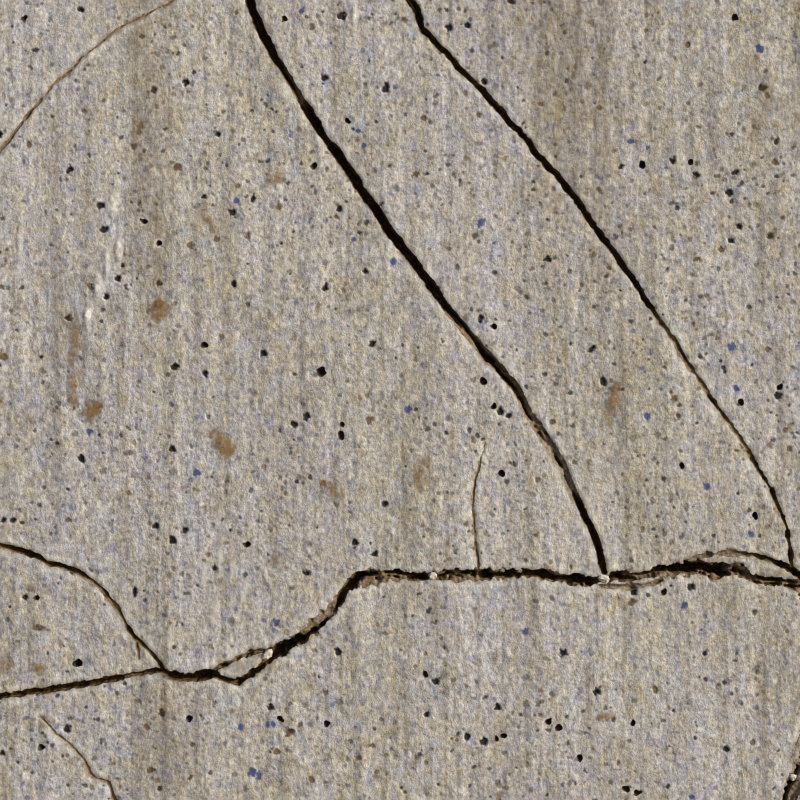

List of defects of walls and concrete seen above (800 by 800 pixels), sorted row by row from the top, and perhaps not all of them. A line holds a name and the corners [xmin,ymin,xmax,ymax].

crack [0,0,175,153]
crack [245,0,608,575]
crack [405,0,794,568]
crack [0,451,800,700]
crack [41,717,118,800]
crack [782,734,800,800]